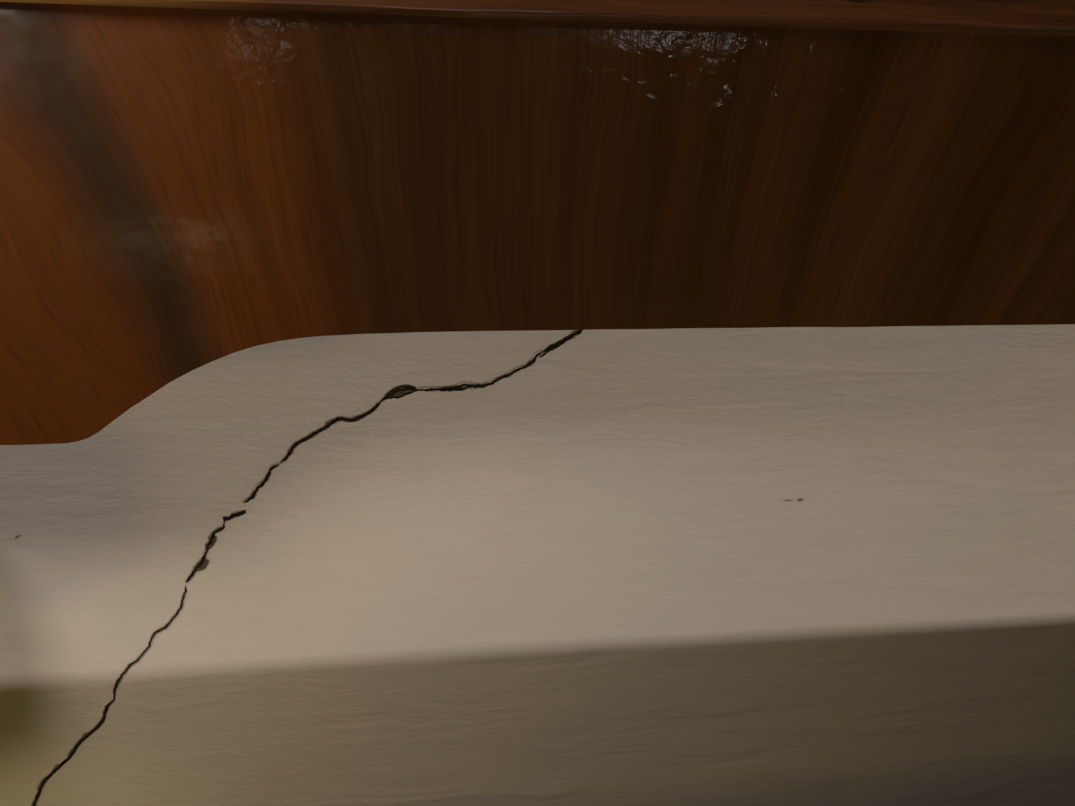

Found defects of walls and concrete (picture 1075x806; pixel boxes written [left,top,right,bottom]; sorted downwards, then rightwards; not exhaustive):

crack [31,330,584,806]